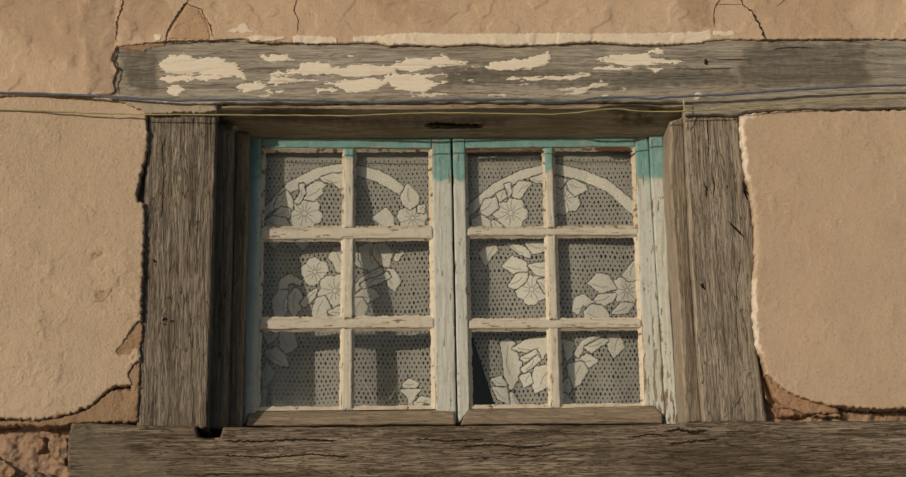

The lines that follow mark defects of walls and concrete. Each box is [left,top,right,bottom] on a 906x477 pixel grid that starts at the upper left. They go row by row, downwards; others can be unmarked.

crack [166,0,238,42]
crack [713,0,781,41]
peeling [119,6,683,103]
spalling [0,320,143,430]
spalling [757,357,841,416]